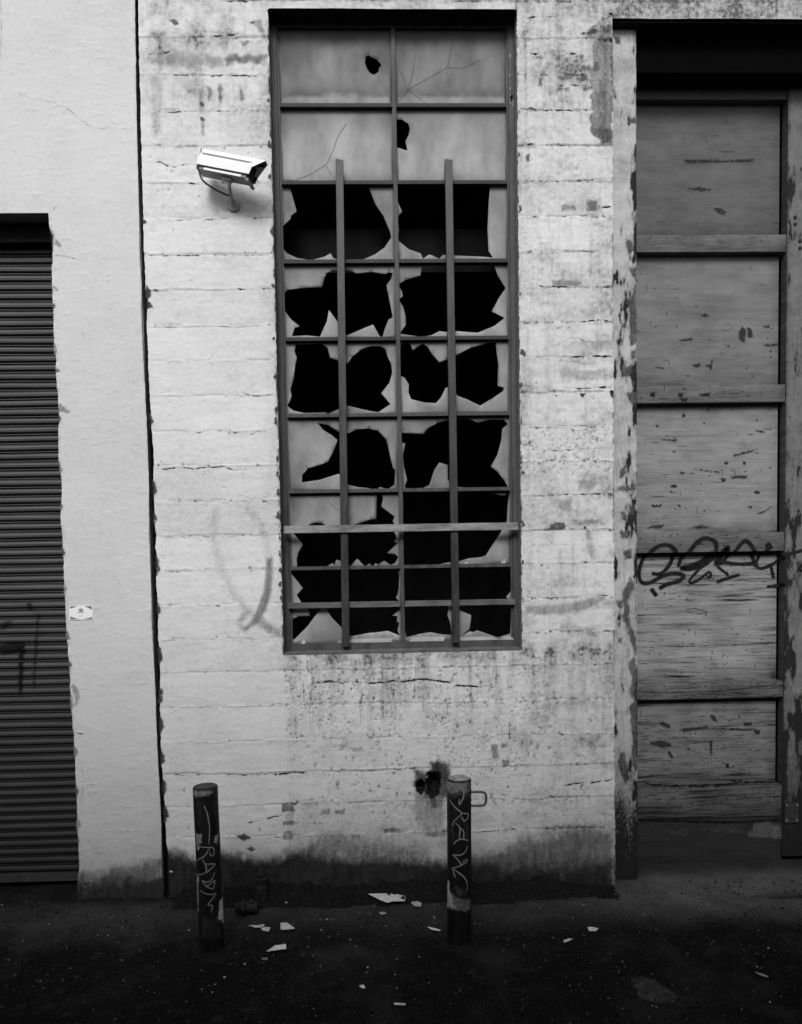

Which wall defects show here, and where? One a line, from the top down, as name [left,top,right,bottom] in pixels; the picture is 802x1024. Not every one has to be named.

leakage [167,41,262,66]
peeling [623,240,637,376]
peeling [620,505,634,558]
crack [164,678,502,708]
peeling [617,578,637,782]
spalling [415,771,441,799]
leakage [282,802,297,839]
leakage [221,835,447,888]
leakage [471,830,615,885]